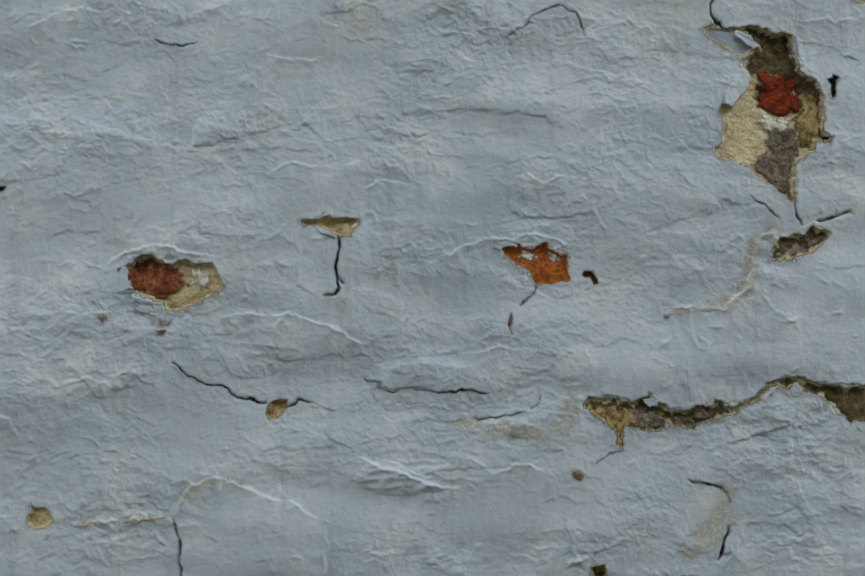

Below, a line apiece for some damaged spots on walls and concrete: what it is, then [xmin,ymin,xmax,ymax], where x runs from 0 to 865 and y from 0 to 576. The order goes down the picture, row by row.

spalling [699,22,839,202]
spalling [112,255,226,316]
spalling [297,216,361,239]
crack [324,236,344,296]
spalling [494,242,570,285]
spalling [582,271,598,285]
spalling [772,224,831,262]
spalling [266,398,287,419]
spalling [583,375,865,449]
crack [173,520,183,576]
spalling [589,565,607,576]